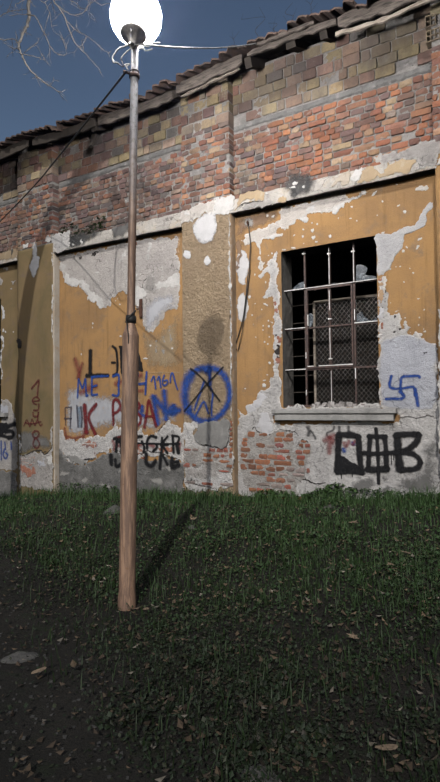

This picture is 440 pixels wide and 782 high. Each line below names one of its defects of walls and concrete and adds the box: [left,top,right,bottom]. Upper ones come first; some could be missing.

peeling [45,230,180,333]
peeling [137,139,440,501]
peeling [0,399,121,497]